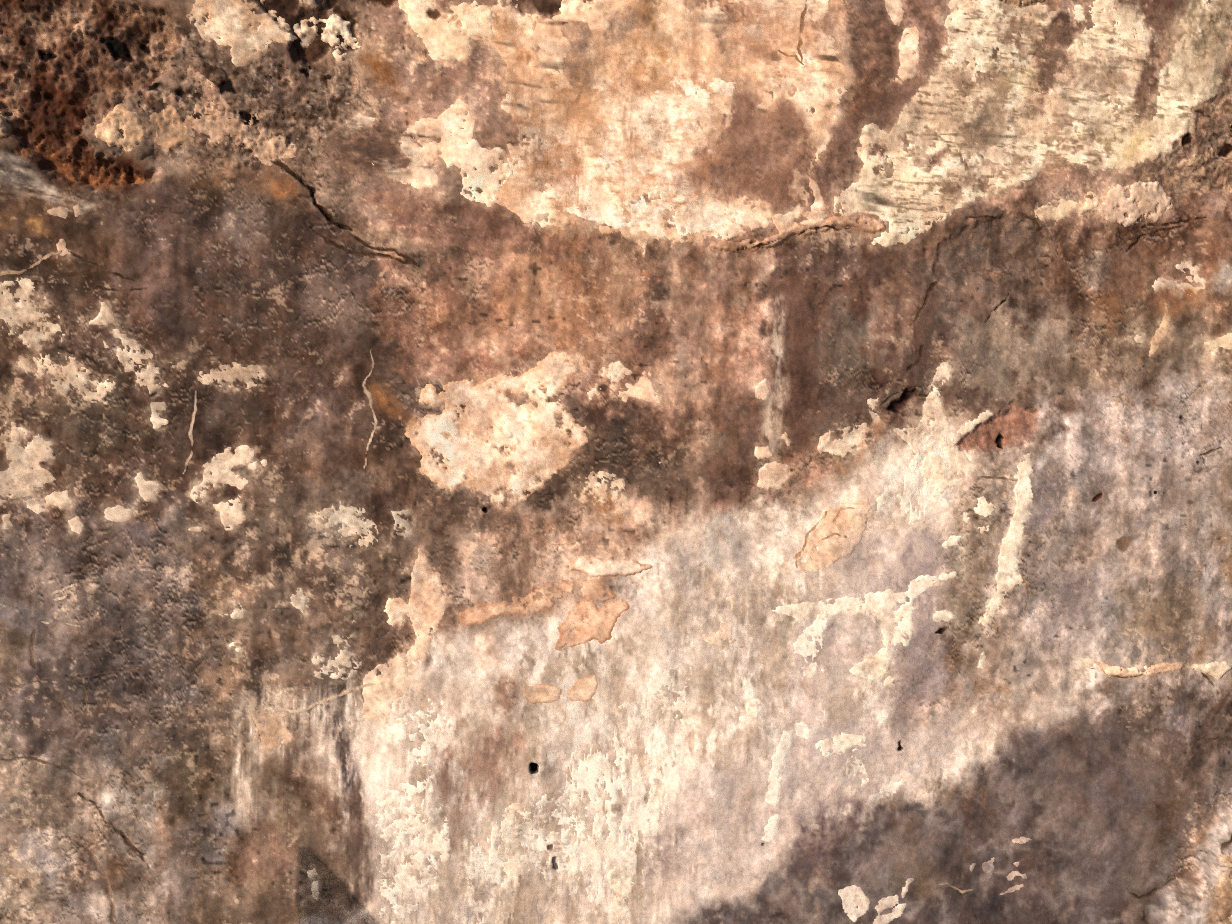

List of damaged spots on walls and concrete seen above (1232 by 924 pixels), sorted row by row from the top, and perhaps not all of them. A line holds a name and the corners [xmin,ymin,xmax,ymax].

corrosion [0,0,62,15]
corrosion [0,60,314,208]
crack [271,160,420,267]
flaking render [364,0,1232,286]
water stain [664,0,1232,234]
crack [1123,217,1207,252]
peeling [0,278,266,429]
flaking render [405,351,588,507]
water stain [1121,404,1232,533]
water stain [182,263,1195,924]
flaking render [311,510,653,924]
crack [0,756,151,870]